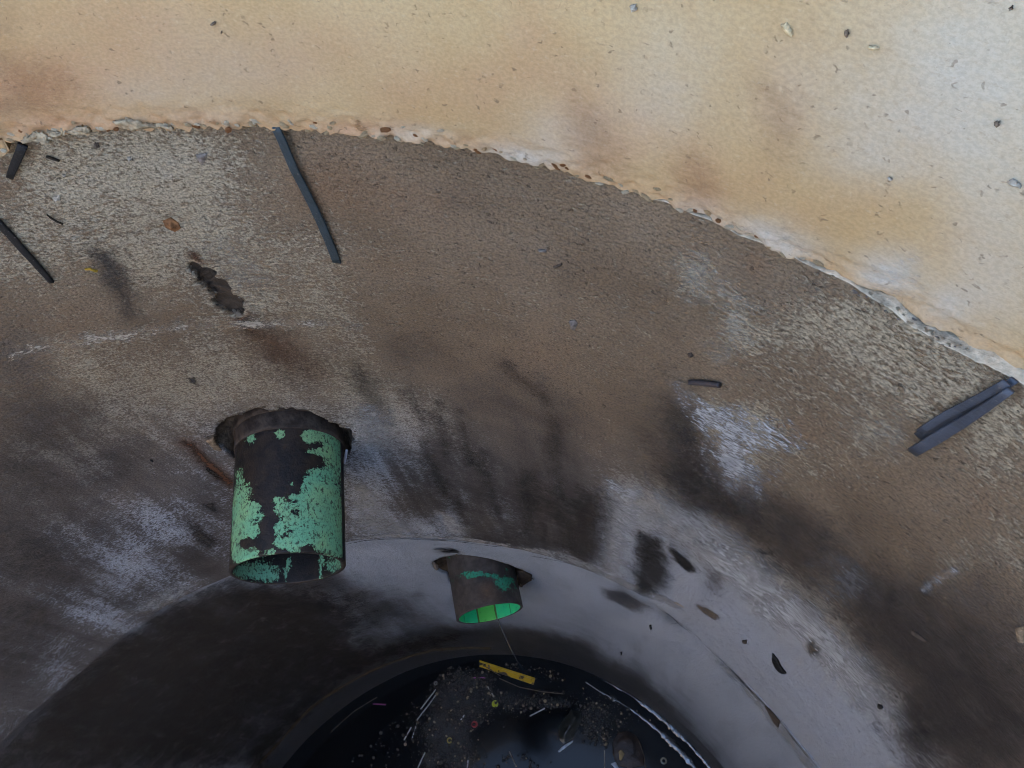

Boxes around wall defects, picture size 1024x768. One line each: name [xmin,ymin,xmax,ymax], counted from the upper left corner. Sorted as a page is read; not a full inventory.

spalling [189,262,245,319]
rust [182,440,233,487]
damp [353,384,908,732]